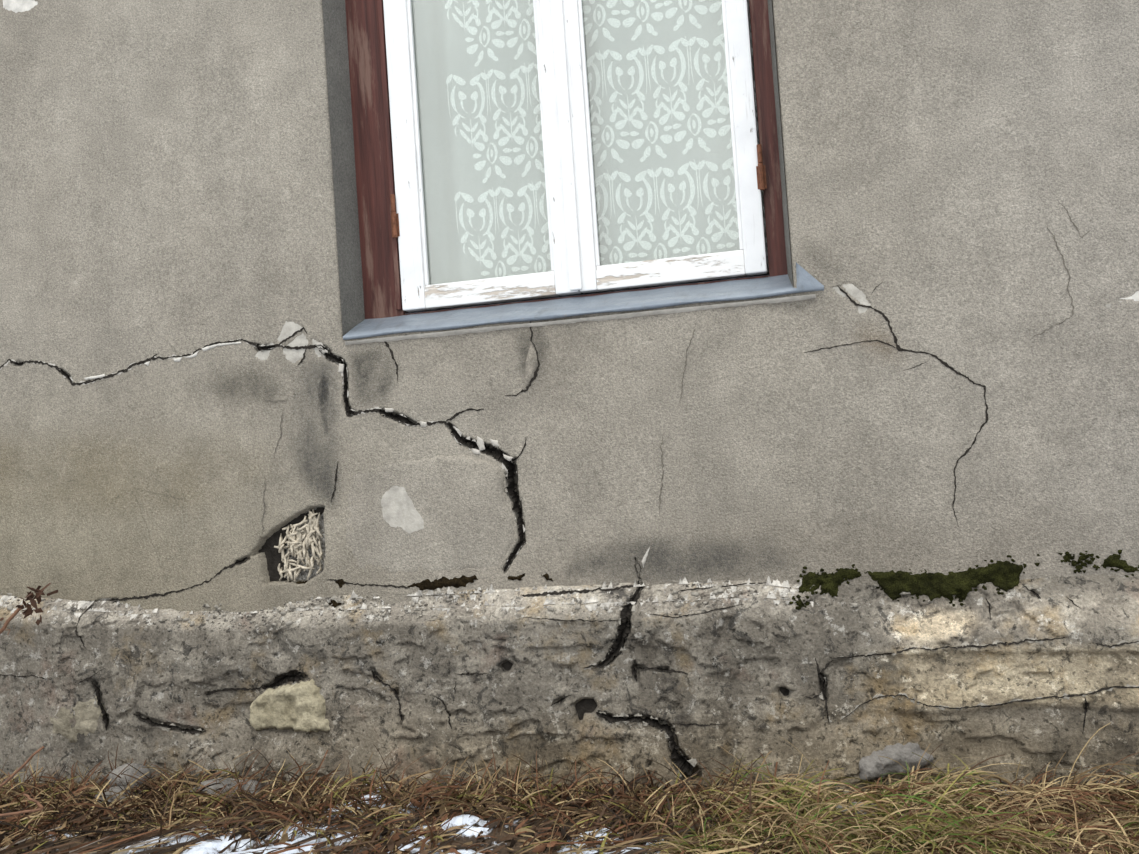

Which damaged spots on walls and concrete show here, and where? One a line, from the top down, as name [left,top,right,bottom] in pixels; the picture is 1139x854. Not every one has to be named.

peeling [3,0,38,13]
crack [804,284,988,527]
crack [0,321,540,572]
flaking render [214,507,326,582]
spalling [0,595,221,620]
crack [75,578,212,647]
spalling [245,576,814,616]
crack [522,547,772,682]
crack [79,669,204,736]
crack [206,672,304,695]
crack [805,599,1139,730]
crack [595,712,722,777]